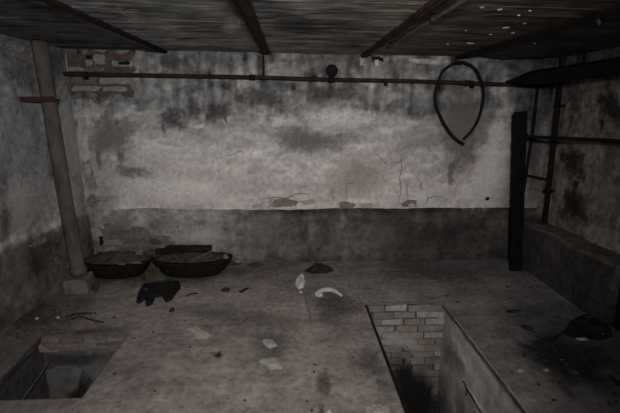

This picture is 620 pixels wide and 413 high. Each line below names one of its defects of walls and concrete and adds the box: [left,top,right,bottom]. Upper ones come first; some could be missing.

flaking render [65,49,137,209]
damp [64,97,229,203]
peeling [252,197,315,208]
damp [282,109,381,150]
crack [372,143,442,204]
damp [445,104,507,201]
damp [556,149,587,222]